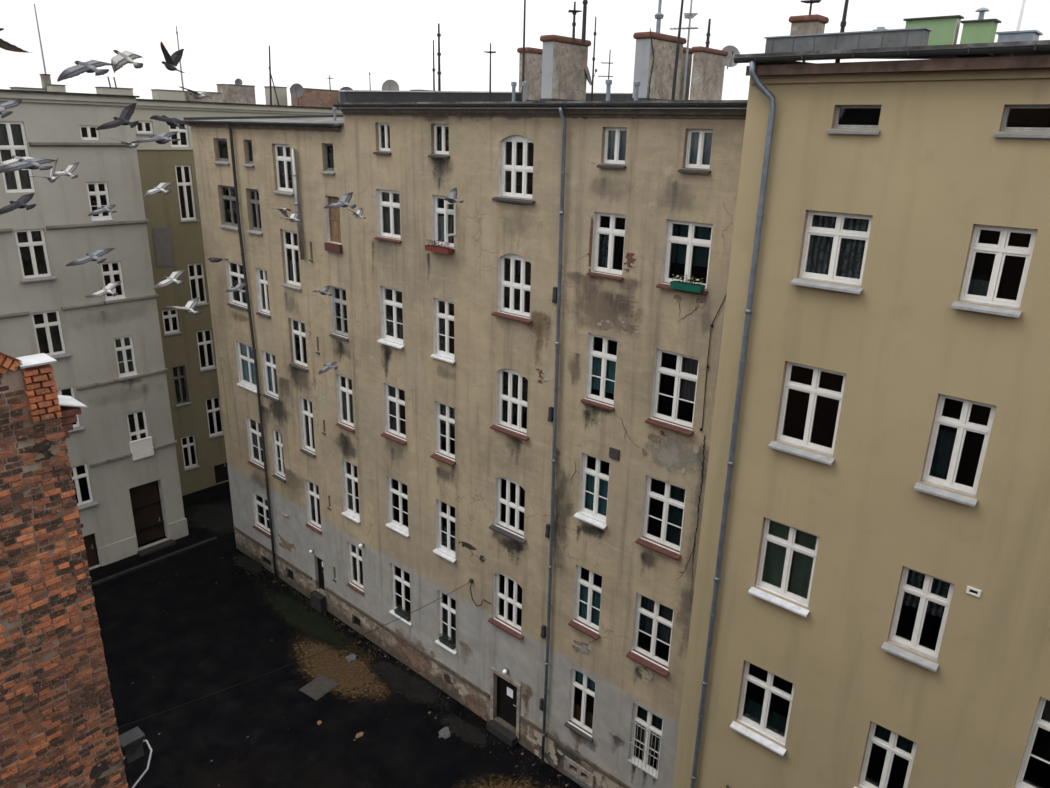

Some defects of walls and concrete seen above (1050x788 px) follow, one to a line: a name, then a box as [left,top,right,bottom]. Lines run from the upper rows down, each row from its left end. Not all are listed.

flaking render [622,252,636,271]
crack [678,435,706,592]
flaking render [592,765,619,788]